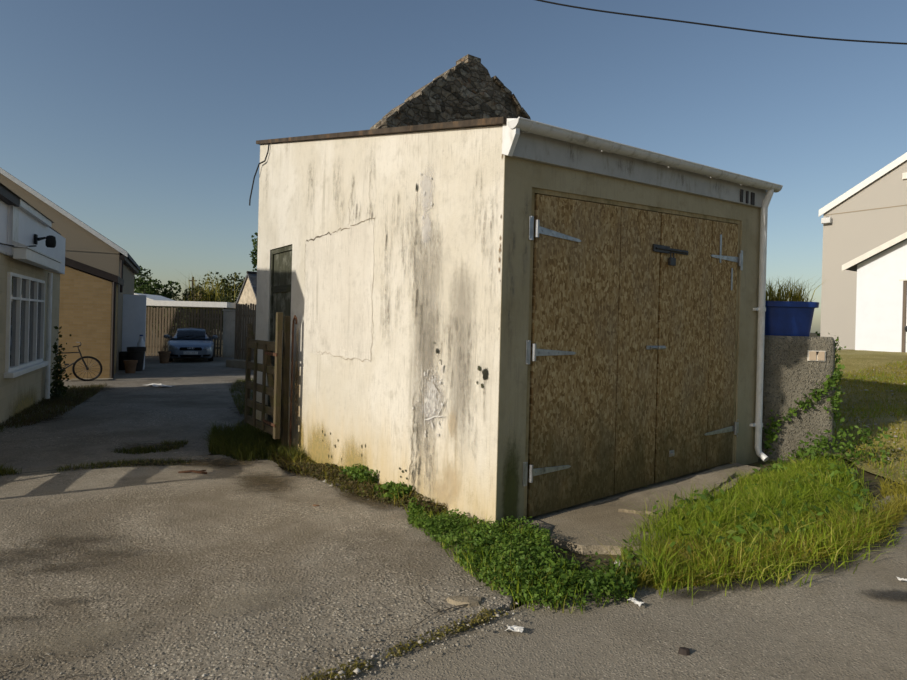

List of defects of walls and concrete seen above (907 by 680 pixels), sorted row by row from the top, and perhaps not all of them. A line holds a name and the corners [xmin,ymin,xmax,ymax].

crack [305,170,375,247]
peeling [412,361,446,437]
water stain [308,433,331,464]
water stain [345,449,365,475]